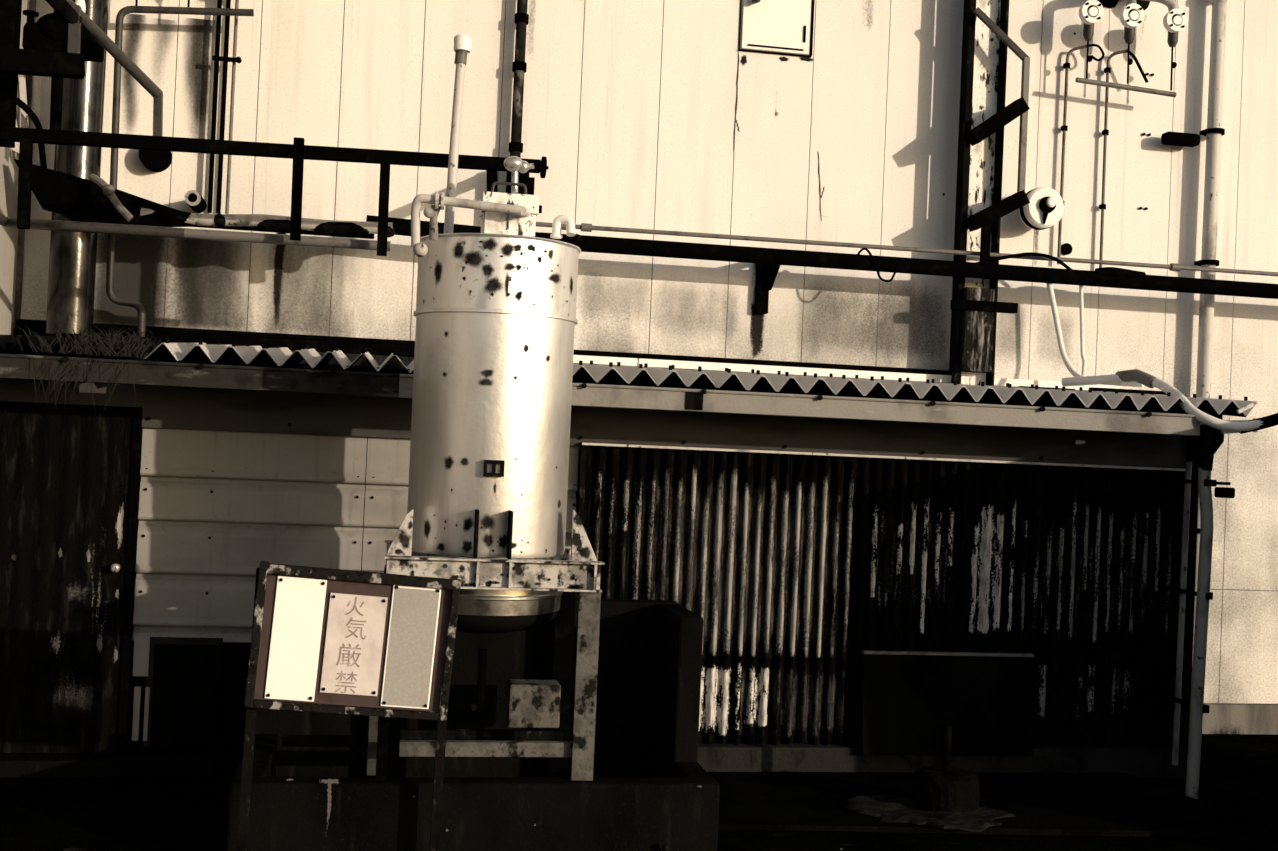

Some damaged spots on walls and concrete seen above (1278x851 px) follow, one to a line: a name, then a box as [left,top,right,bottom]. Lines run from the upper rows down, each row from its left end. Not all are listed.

damp [124,14,144,121]
damp [188,18,213,124]
corrosion [991,0,1000,94]
corrosion [975,151,994,205]
damp [93,233,238,328]